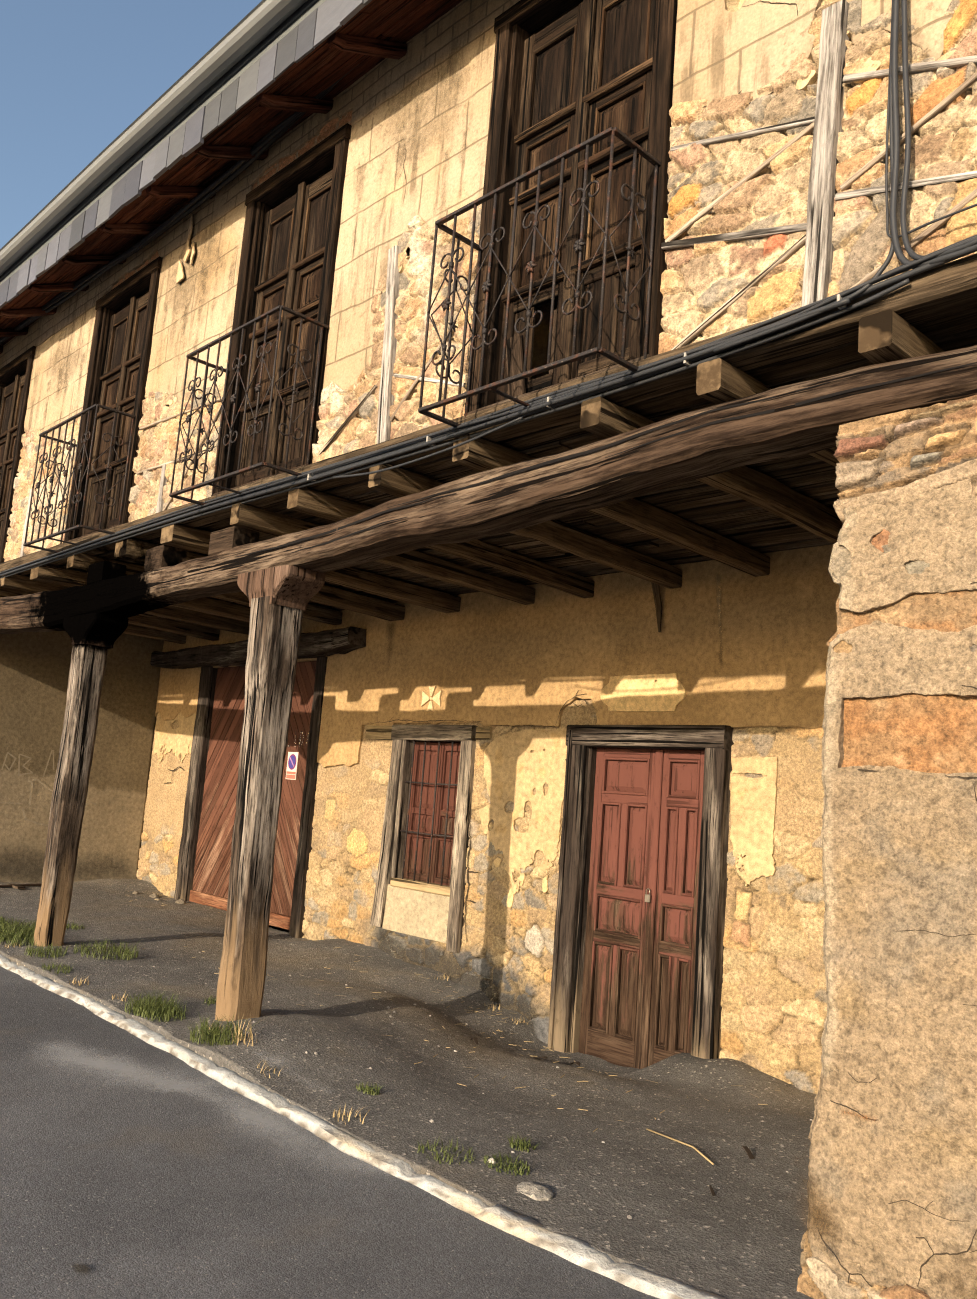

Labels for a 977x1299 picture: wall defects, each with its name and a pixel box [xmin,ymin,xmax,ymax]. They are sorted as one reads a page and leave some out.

spalling [658,0,977,354]
spalling [312,205,482,463]
spalling [128,383,225,522]
peeling [478,729,567,909]
crack [818,1229,872,1287]
crack [888,1200,977,1287]